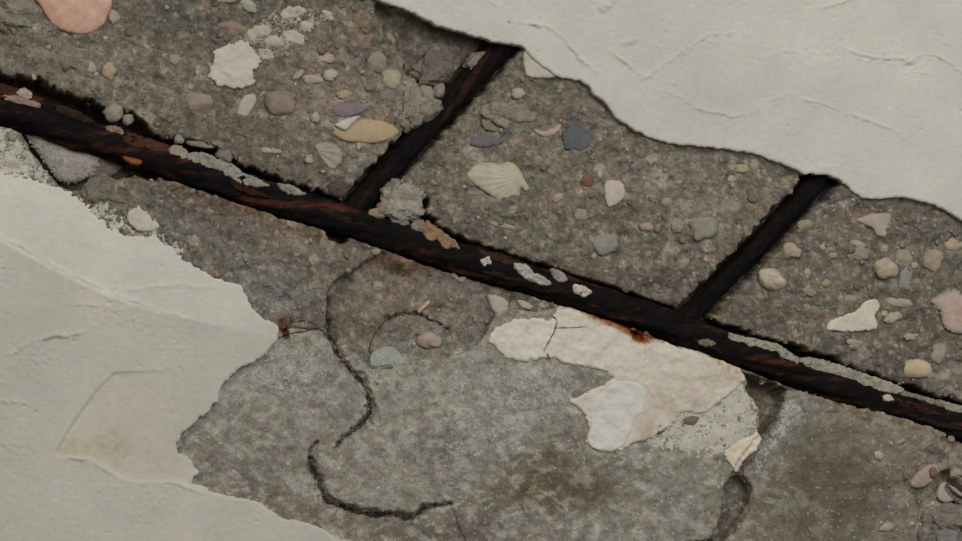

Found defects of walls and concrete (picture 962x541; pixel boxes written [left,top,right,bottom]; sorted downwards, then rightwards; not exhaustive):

corrosion [123,156,143,166]
spalling [0,0,488,203]
spalling [393,47,807,311]
crack [278,306,450,521]
spalling [0,126,844,541]
corrosion [599,318,654,342]
spalling [700,179,962,405]
spalling [899,436,962,541]